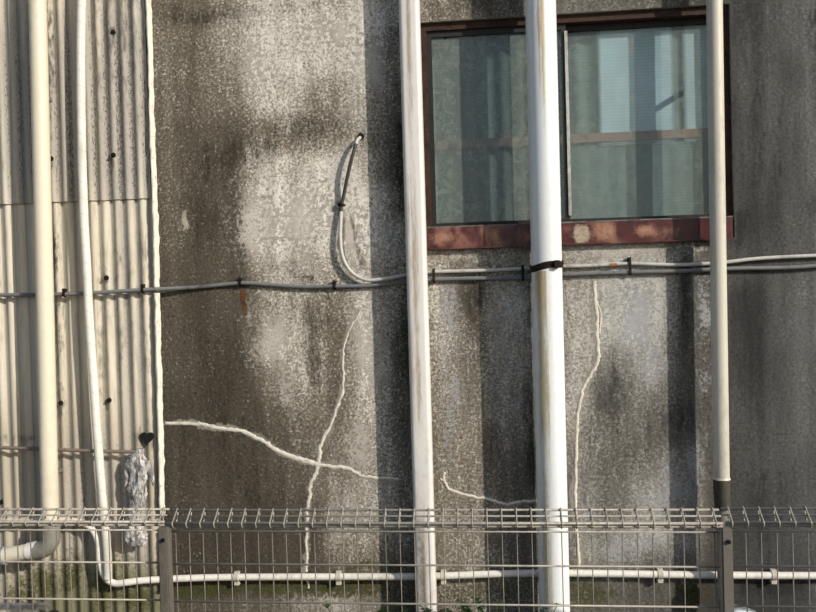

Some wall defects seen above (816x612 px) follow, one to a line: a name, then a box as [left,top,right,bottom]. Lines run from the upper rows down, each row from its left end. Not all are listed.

damp [397,124,409,210]
damp [402,226,420,403]
crack [163,308,399,589]
crack [440,470,537,509]
crack [568,277,602,568]